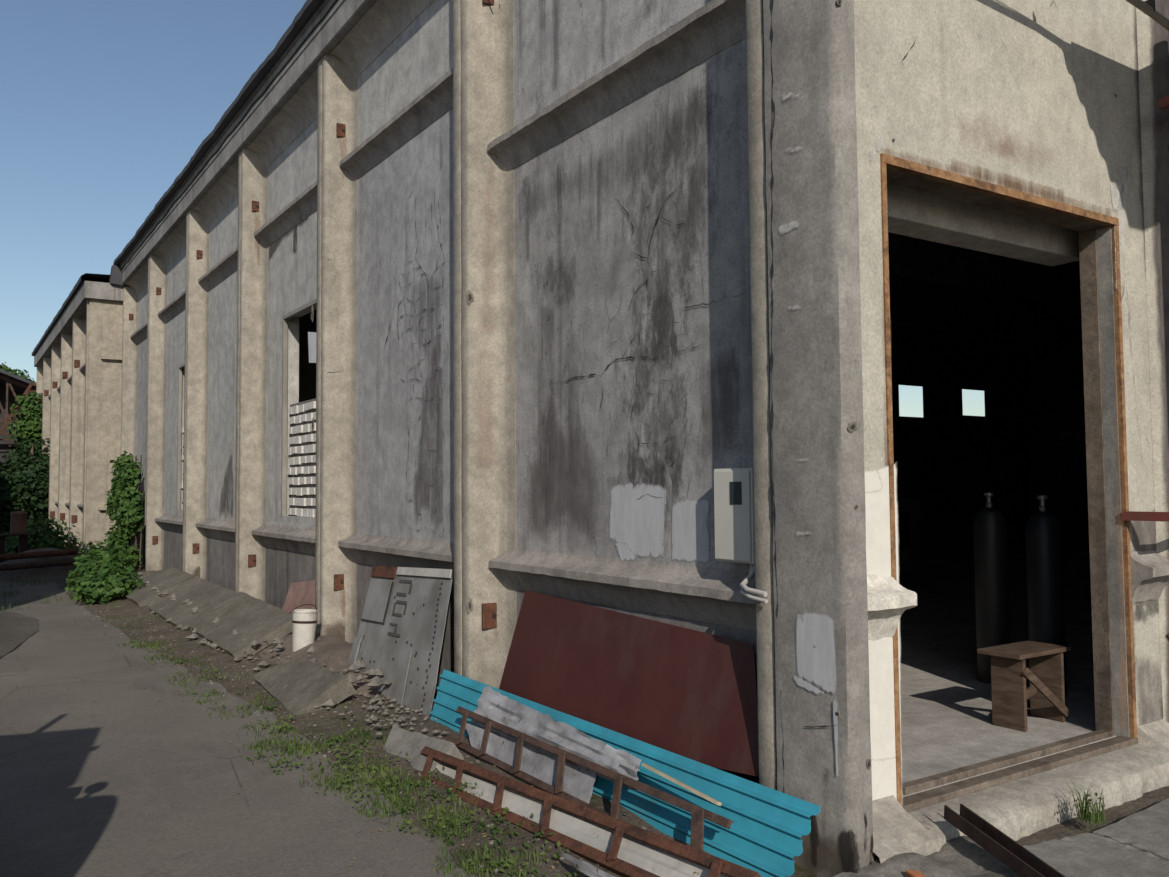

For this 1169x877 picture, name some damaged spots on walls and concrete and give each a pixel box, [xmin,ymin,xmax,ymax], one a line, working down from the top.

damp [415,350,439,511]
crack [547,176,743,500]
crack [770,0,779,618]
damp [1133,521,1169,552]
damp [1135,0,1169,508]
damp [1136,582,1169,724]